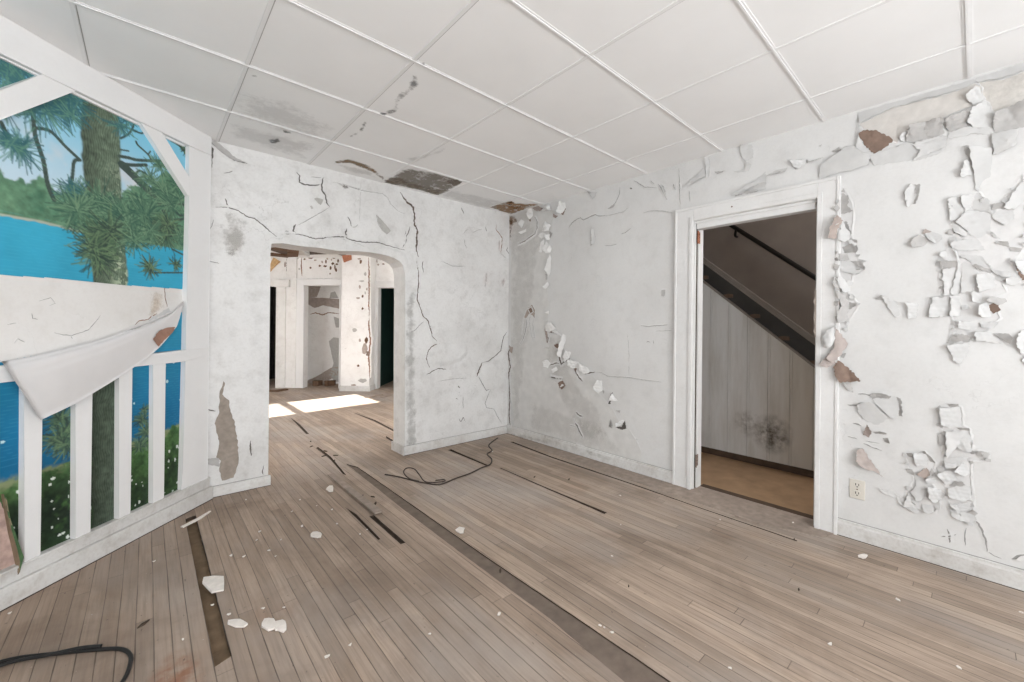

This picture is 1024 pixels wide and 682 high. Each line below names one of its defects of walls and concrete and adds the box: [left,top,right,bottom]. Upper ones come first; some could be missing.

flaking render [208,380,241,482]
peeling [271,249,385,386]
crack [210,141,514,426]
peeling [510,201,642,462]
peeling [731,62,1024,364]
peeling [819,188,992,526]
crack [940,517,1024,563]